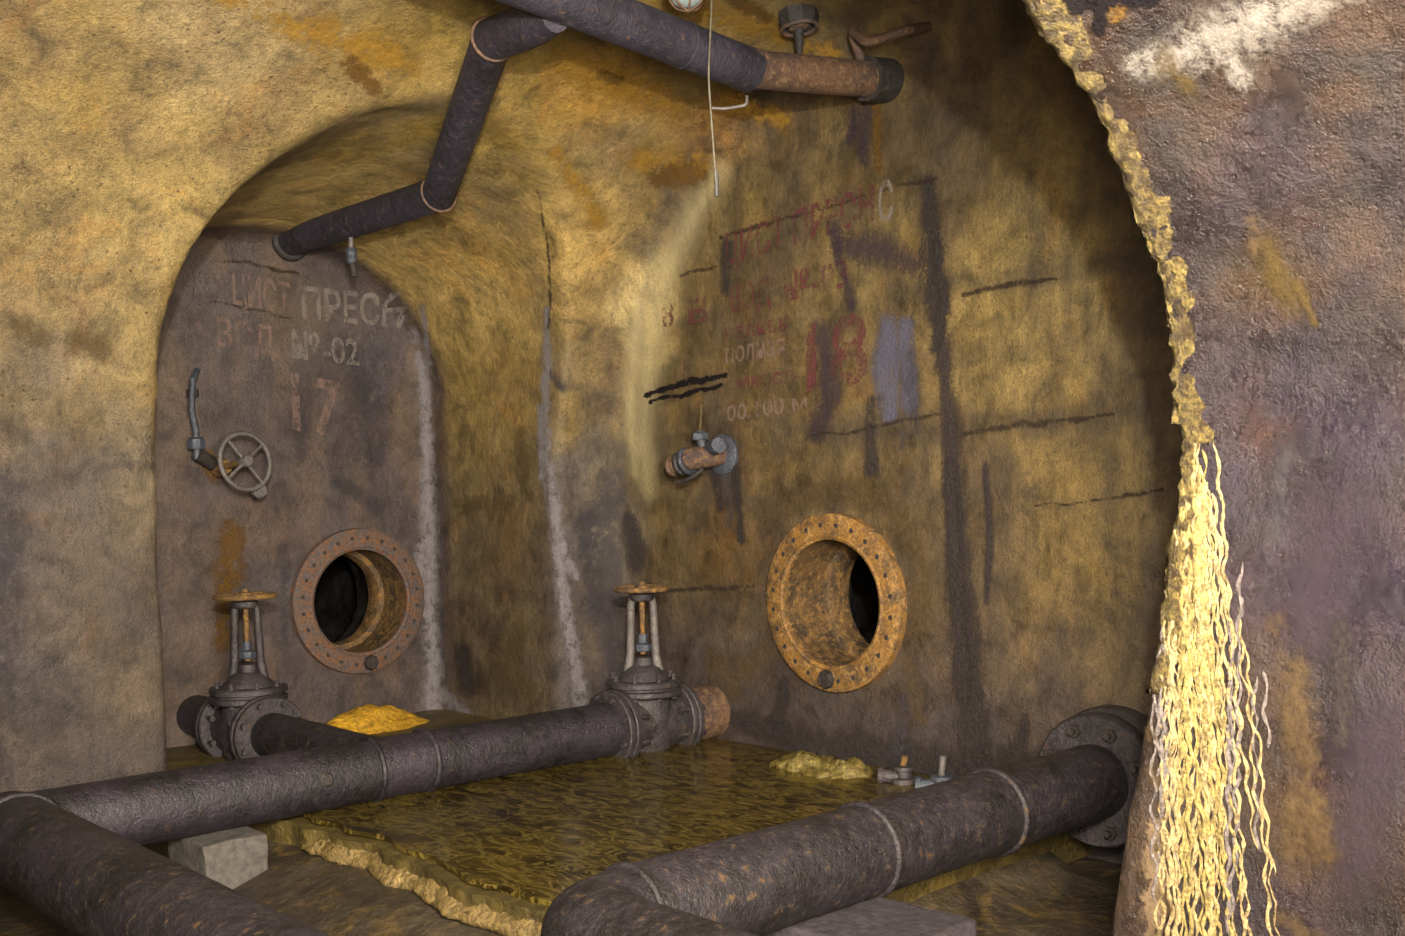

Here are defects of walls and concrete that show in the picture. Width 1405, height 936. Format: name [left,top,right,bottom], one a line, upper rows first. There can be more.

damp [1125,0,1337,89]
damp [721,240,734,294]
rust [213,519,247,651]
damp [411,305,475,715]
damp [517,307,589,707]
damp [710,463,745,544]
damp [729,177,1040,779]
damp [1022,0,1280,936]